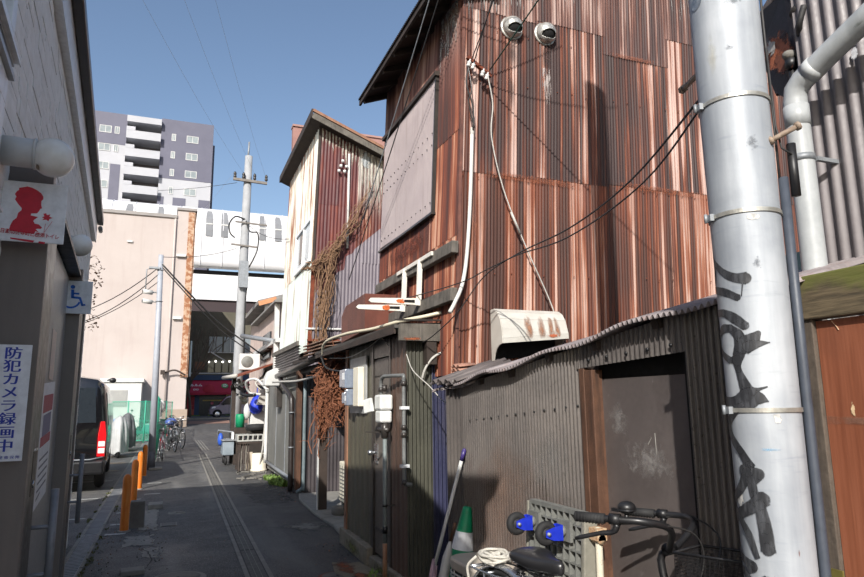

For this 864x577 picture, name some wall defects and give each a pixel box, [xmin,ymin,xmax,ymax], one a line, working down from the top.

corrosion [542,52,550,94]
corrosion [764,31,793,74]
corrosion [525,318,560,338]